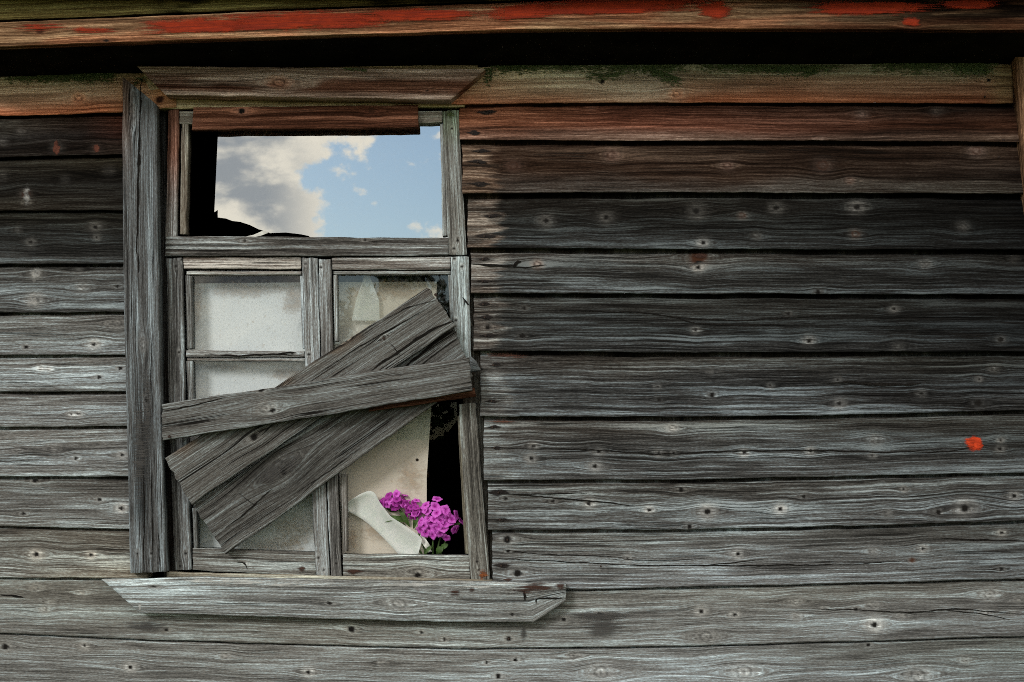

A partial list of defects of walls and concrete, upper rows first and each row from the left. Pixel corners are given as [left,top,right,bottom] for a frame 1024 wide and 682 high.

peeling [14,24,115,33]
peeling [144,0,732,34]
peeling [810,0,998,26]
crack [823,608,1016,619]